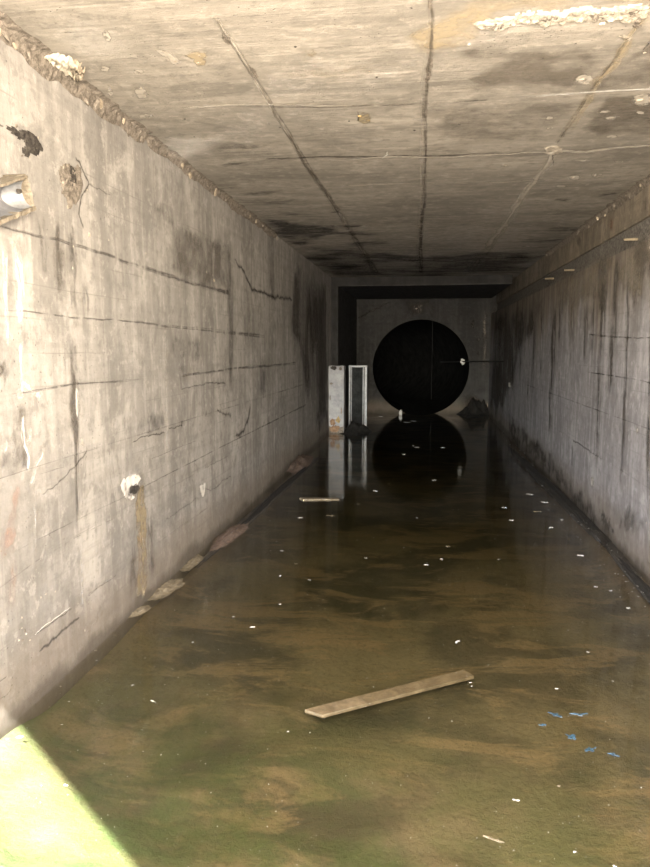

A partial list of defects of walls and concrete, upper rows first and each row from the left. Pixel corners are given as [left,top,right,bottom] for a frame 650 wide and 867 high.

spalling [0,11,278,240]
crack [238,54,650,262]
water stain [479,54,583,85]
spalling [413,3,650,49]
water stain [593,97,650,131]
peeling [634,94,650,114]
water stain [270,214,529,276]
water stain [471,309,542,408]
water stain [533,253,647,428]
rust [132,486,153,595]